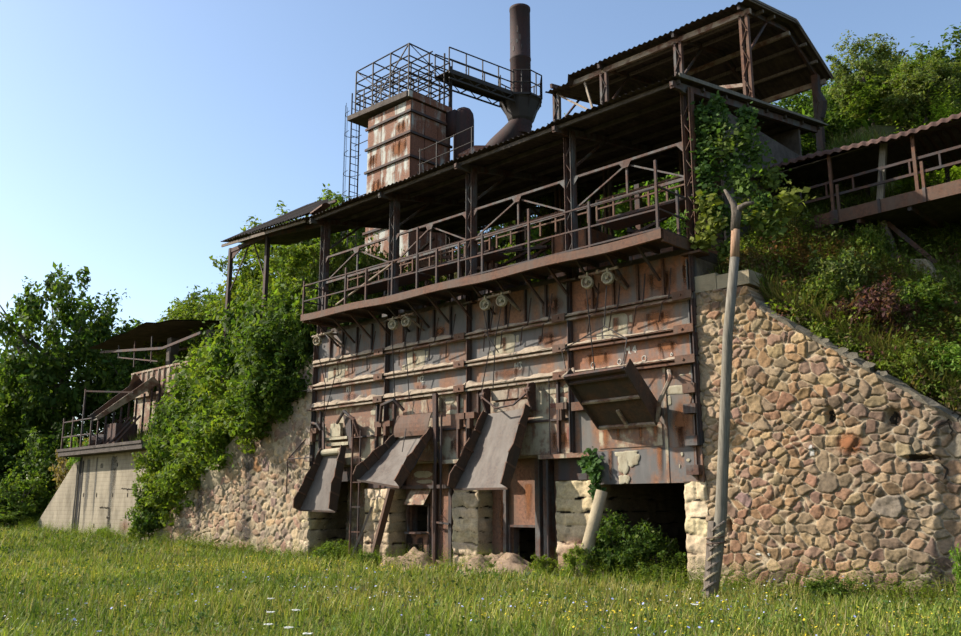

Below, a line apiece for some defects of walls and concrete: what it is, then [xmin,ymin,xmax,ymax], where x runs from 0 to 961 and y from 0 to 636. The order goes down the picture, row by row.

corrosion [393,118,408,156]
peeling [608,449,640,484]